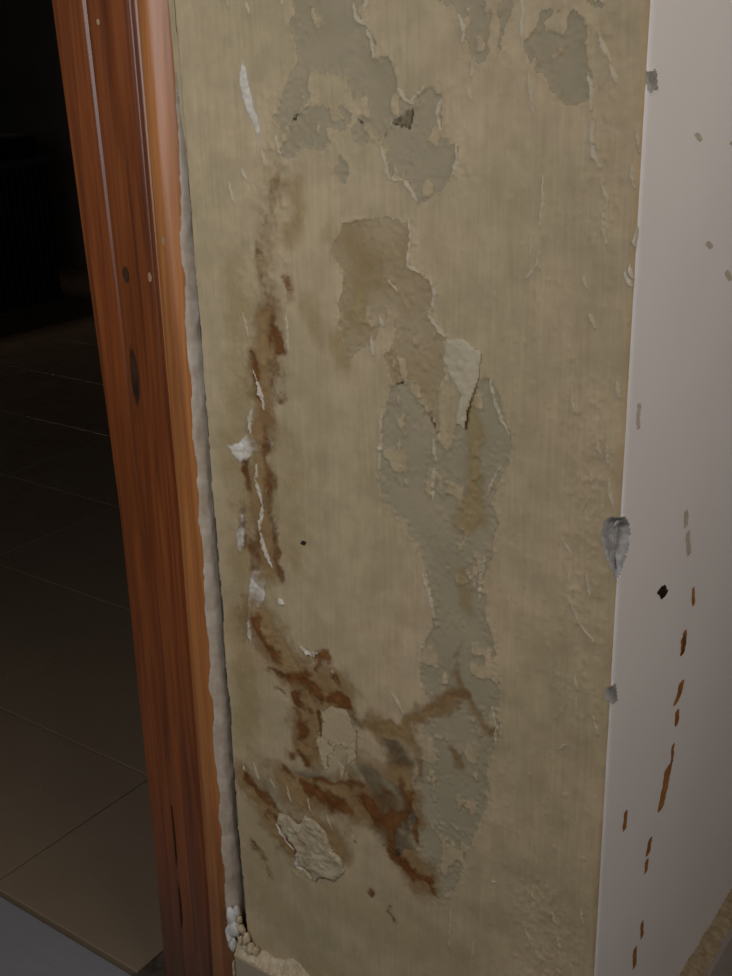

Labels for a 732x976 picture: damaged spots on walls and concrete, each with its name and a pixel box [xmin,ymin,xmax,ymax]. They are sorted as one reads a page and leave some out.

peeling [272,0,459,204]
peeling [440,0,619,168]
peeling [247,370,265,434]
corrosion [241,304,285,581]
peeling [254,464,273,568]
peeling [330,217,512,903]
flaking render [602,517,631,579]
peeling [316,706,357,777]
corrosion [234,598,495,894]
flaking render [605,684,618,704]
flaking render [276,797,345,883]